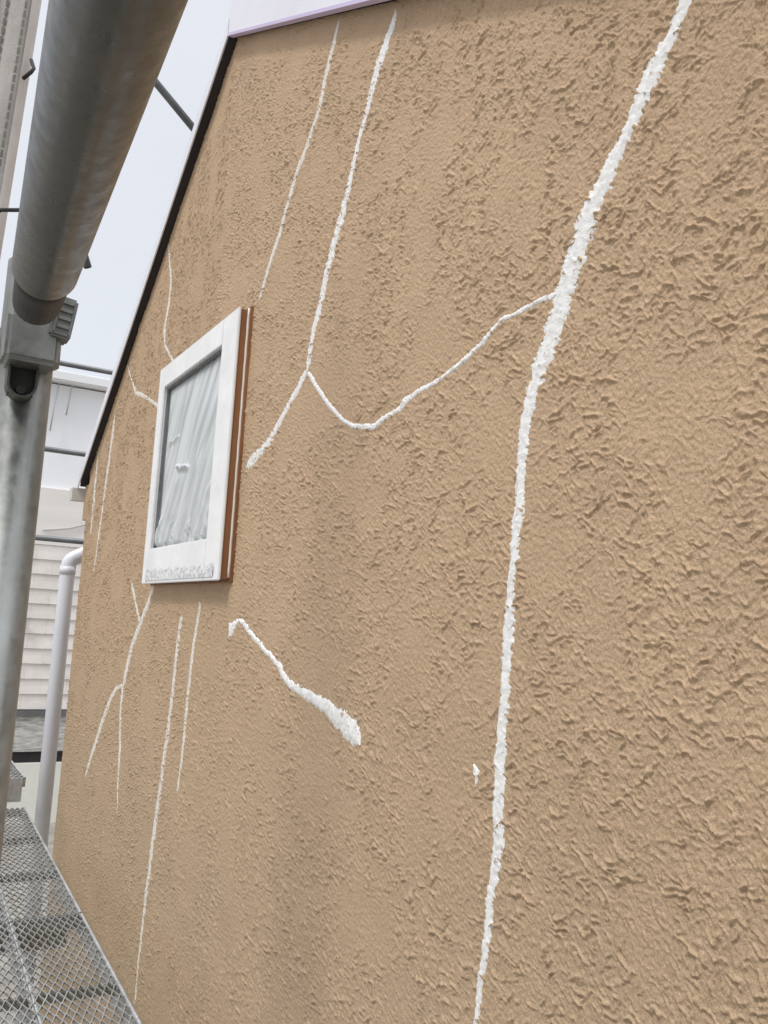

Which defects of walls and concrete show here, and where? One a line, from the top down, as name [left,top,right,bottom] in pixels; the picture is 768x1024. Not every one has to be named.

crack [85,583,154,809]
crack [134,602,201,1005]
crack [246,0,692,1024]